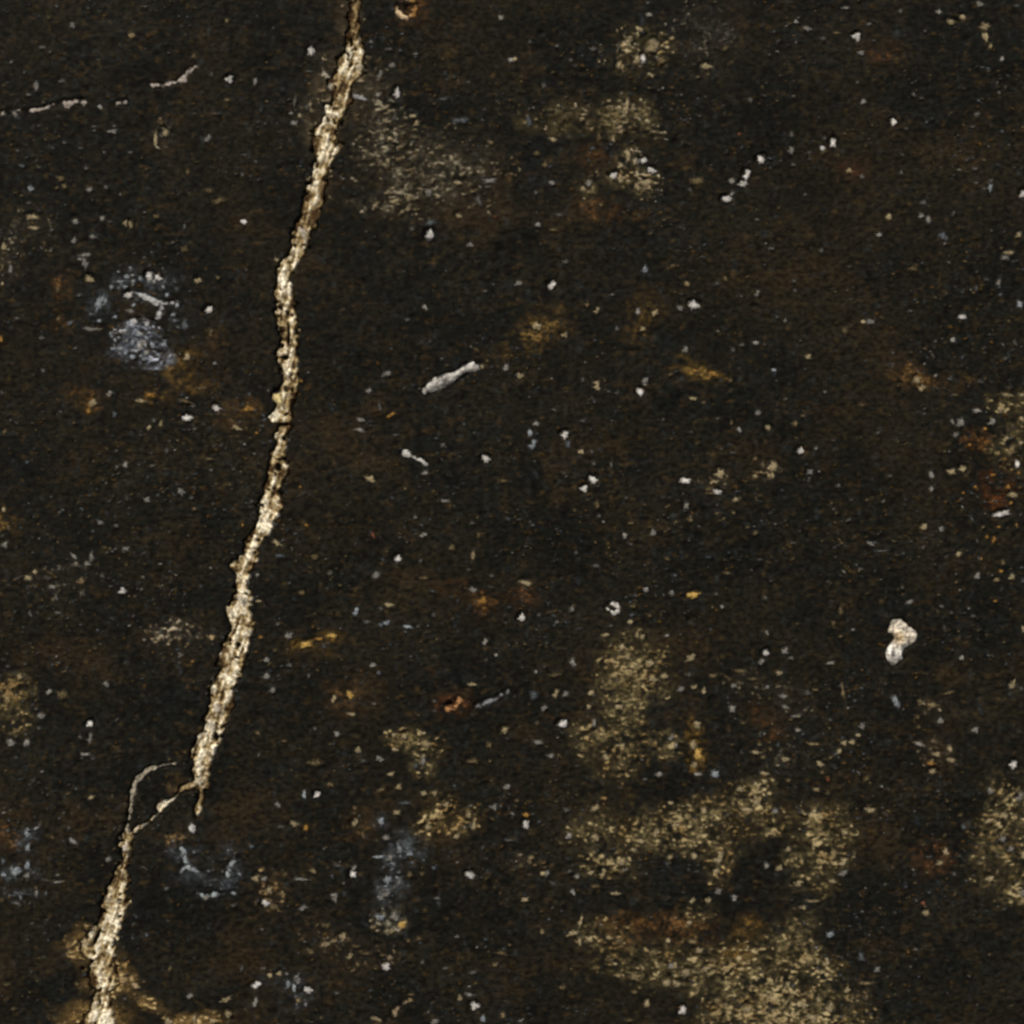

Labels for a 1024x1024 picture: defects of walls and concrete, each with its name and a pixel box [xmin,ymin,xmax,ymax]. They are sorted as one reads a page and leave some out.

water stain [90,267,175,370]
crack [66,0,367,1024]